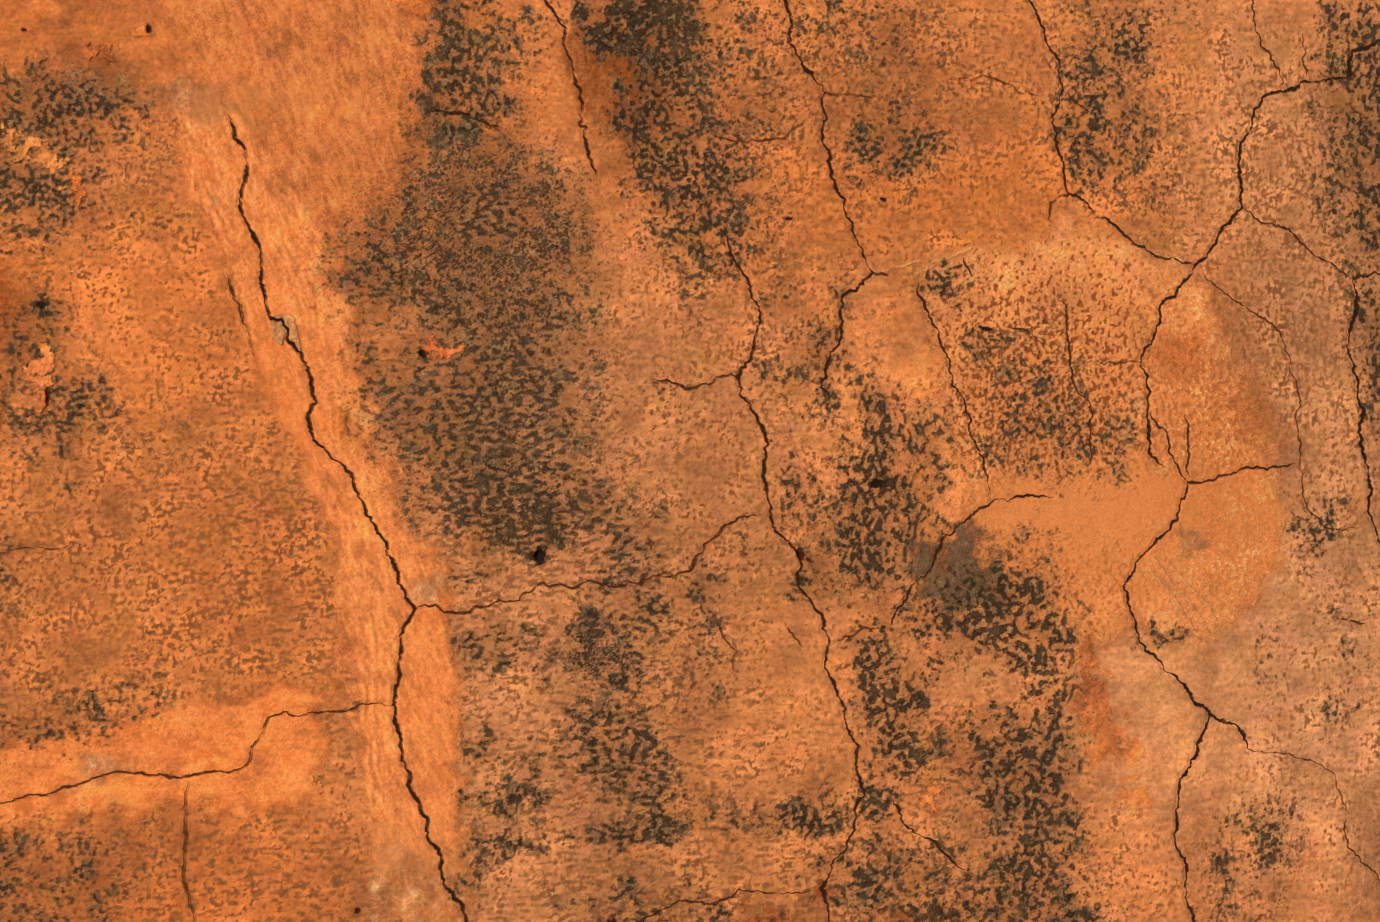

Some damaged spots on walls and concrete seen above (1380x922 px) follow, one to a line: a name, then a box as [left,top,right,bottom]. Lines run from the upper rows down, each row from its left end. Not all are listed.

water stain [0,58,186,255]
mould [1045,0,1184,216]
water stain [1307,0,1380,441]
water stain [0,534,38,593]
water stain [0,279,130,492]
crack [0,0,1050,922]
water stain [315,0,1153,922]
crack [949,0,1380,922]
water stain [0,632,176,772]
mould [0,811,159,922]
mould [1197,760,1309,922]